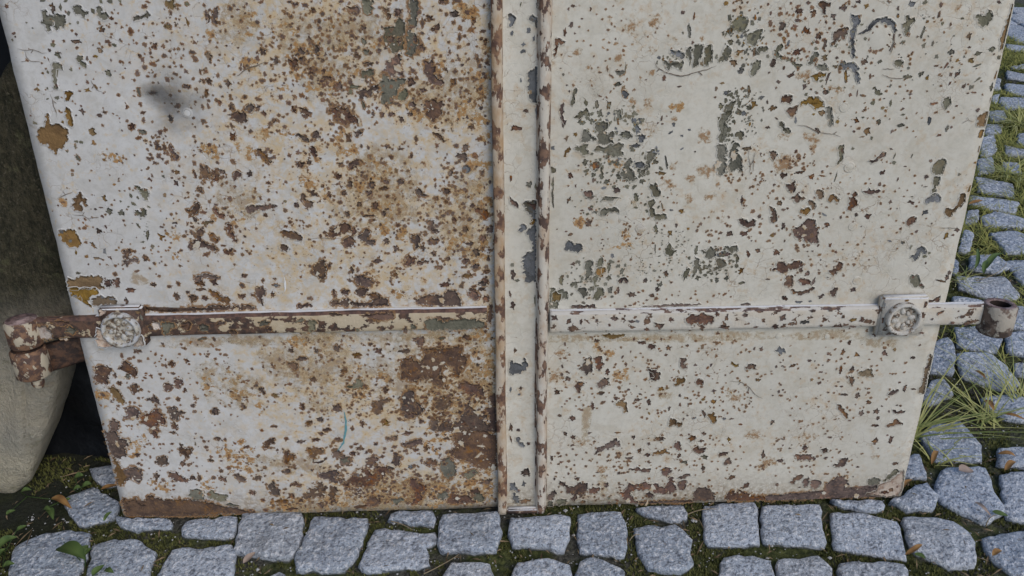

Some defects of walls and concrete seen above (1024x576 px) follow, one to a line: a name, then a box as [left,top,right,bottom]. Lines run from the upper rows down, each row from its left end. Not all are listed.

corrosion [235,127,295,161]
corrosion [279,22,362,100]
corrosion [333,128,407,241]
corrosion [422,41,493,265]
peeling [506,2,538,54]
peeling [520,65,538,119]
peeling [25,0,532,512]
peeling [508,182,537,310]
peeling [546,0,1014,507]
corrosion [120,328,497,518]
corrosion [639,498,693,506]
corrosion [724,475,879,503]